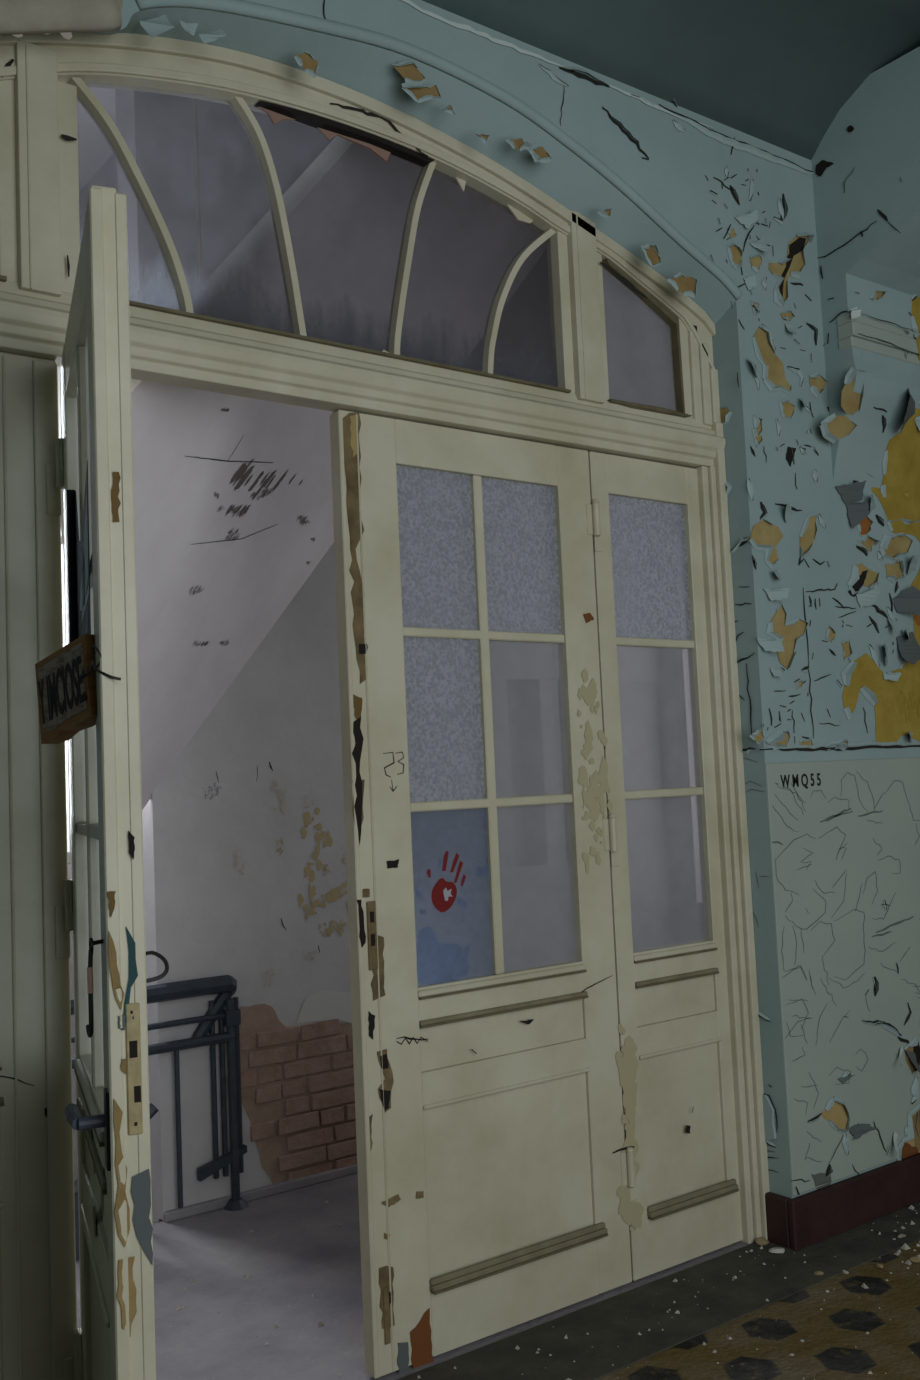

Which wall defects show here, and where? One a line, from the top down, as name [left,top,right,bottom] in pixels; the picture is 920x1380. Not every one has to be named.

peeling [392,60,456,116]
peeling [475,132,552,163]
peeling [641,244,698,299]
peeling [727,198,865,466]
peeling [905,294,920,366]
peeling [720,406,733,426]
peeling [725,479,818,569]
peeling [749,388,920,749]
peeling [899,1037,920,1074]
flaking render [239,1004,357,1184]
peeling [822,1075,877,1139]
peeling [893,1103,920,1161]